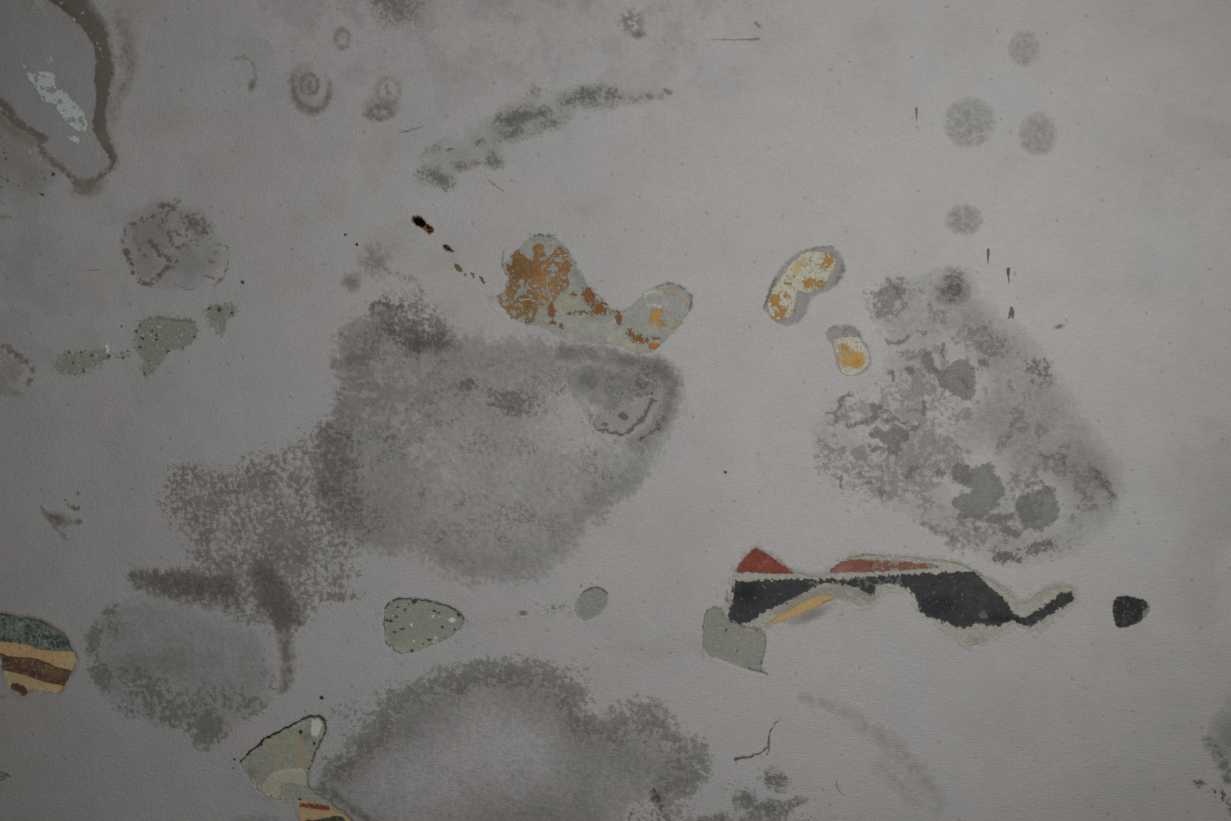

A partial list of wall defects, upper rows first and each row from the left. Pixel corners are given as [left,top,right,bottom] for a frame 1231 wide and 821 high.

peeling [0,0,117,193]
peeling [492,234,693,354]
peeling [766,247,844,324]
flaking render [52,302,235,378]
peeling [828,326,870,375]
leakage [833,395,927,452]
leakage [936,465,1054,563]
flaking render [383,597,464,653]
flaking render [703,607,768,674]